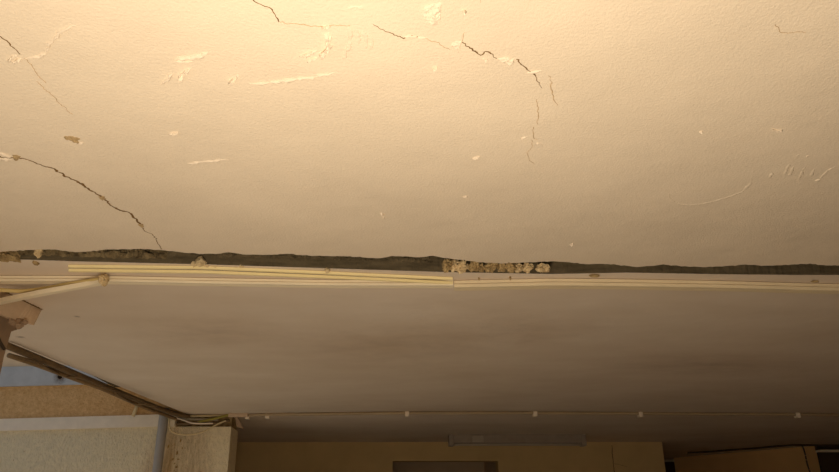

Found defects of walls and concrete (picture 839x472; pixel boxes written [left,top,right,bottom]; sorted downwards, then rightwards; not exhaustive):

crack [253,0,343,27]
crack [0,36,73,115]
crack [374,25,558,163]
crack [0,152,162,249]